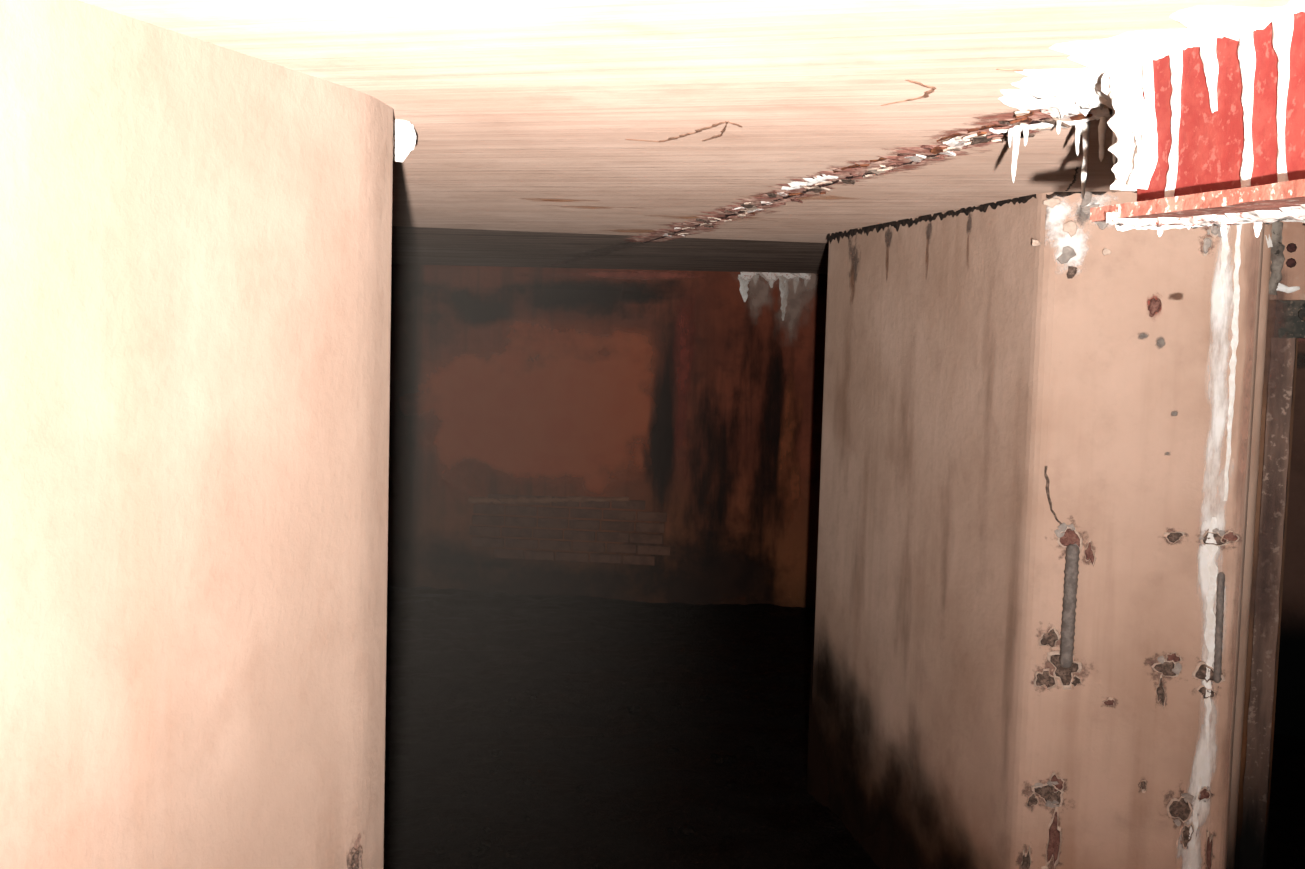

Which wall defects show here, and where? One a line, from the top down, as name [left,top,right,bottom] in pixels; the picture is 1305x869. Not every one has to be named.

damp [1107,48,1183,198]
damp [1200,38,1218,113]
damp [1238,30,1256,188]
damp [1272,10,1294,183]
damp [421,281,673,324]
damp [738,272,818,326]
spalling [1031,520,1096,690]
spalling [1144,572,1225,709]
spalling [1164,528,1242,548]
damp [1179,224,1256,869]
spalling [1016,771,1067,869]
spalling [1166,786,1215,869]